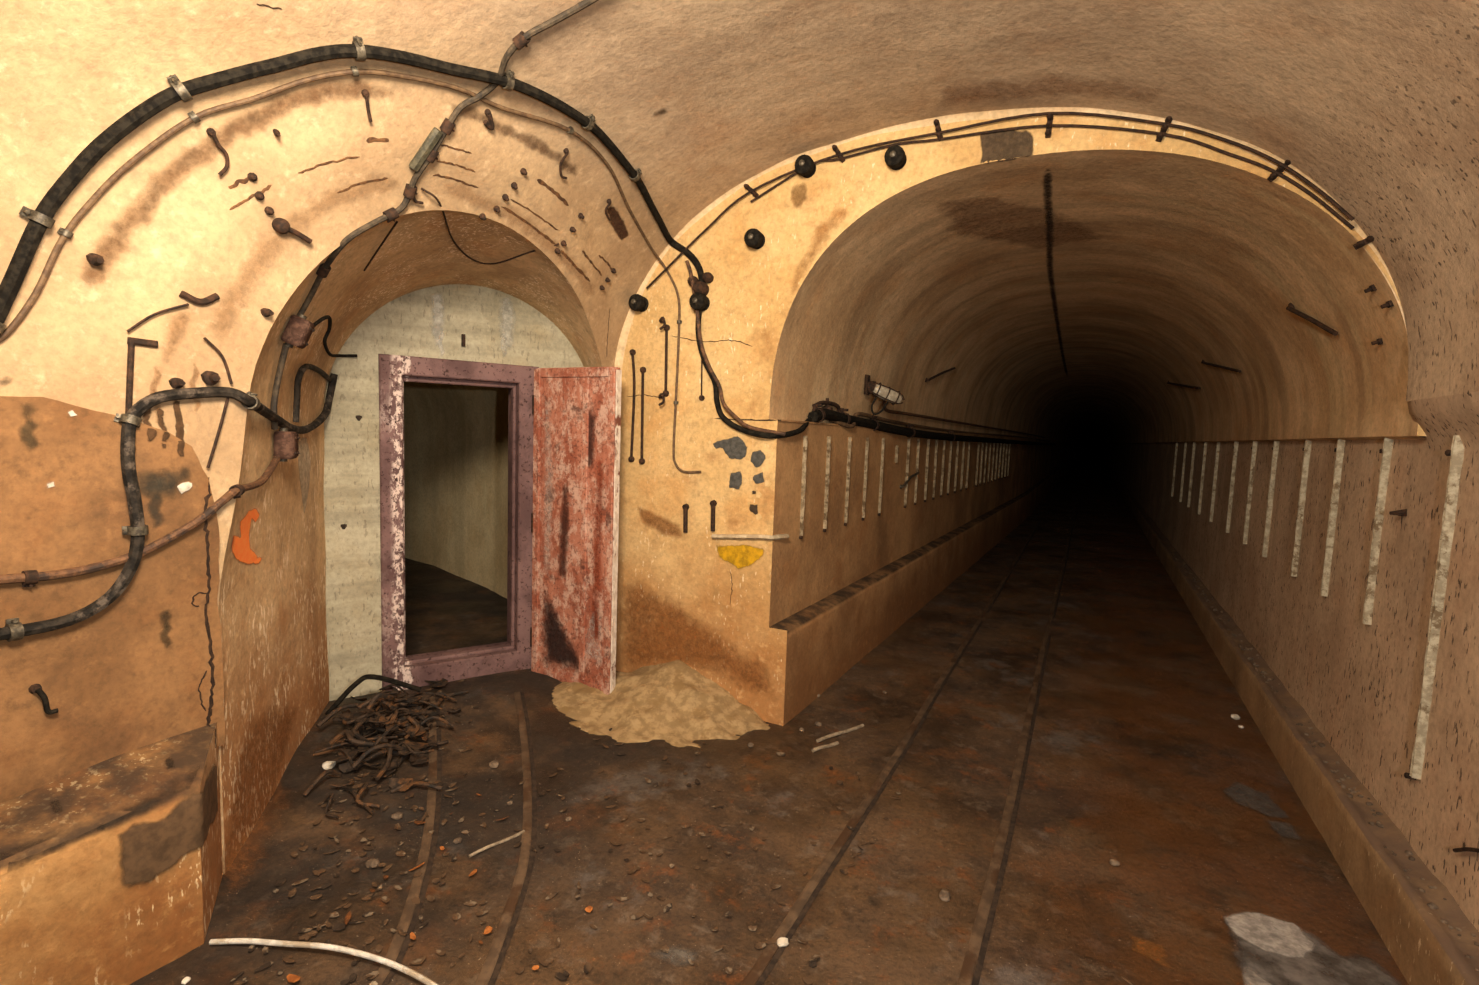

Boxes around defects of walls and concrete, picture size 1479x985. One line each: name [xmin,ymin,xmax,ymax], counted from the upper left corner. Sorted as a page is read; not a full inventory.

rust [559,488,569,576]
rust [588,413,602,635]